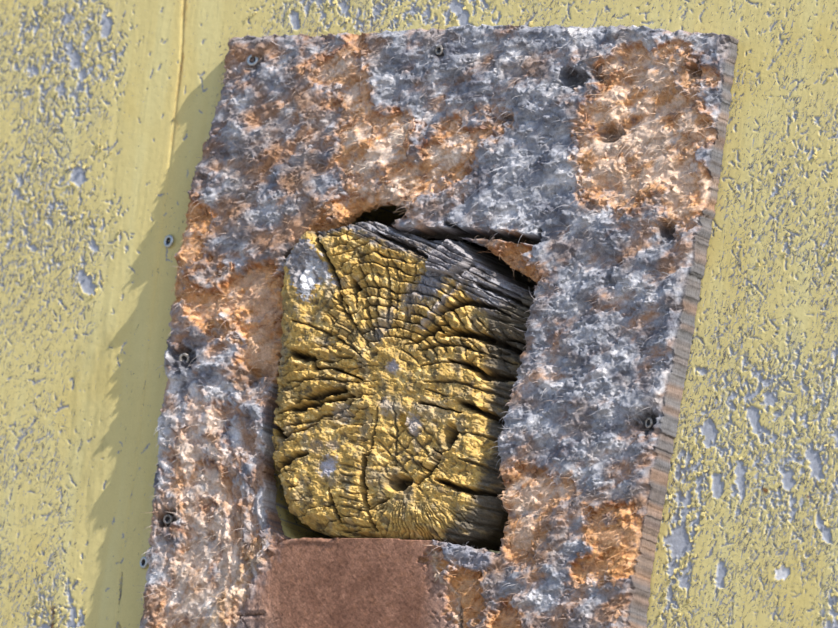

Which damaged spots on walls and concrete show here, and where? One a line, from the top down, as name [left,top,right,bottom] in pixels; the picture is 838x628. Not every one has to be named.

peeling [0,0,126,321]
peeling [760,111,834,198]
crack [313,232,362,309]
crack [376,221,542,259]
peeling [775,219,838,271]
crack [402,283,530,355]
crack [446,358,518,382]
crack [275,351,363,473]
crack [417,400,505,425]
crack [415,448,503,500]
peeling [658,333,838,628]
peeling [30,576,86,628]